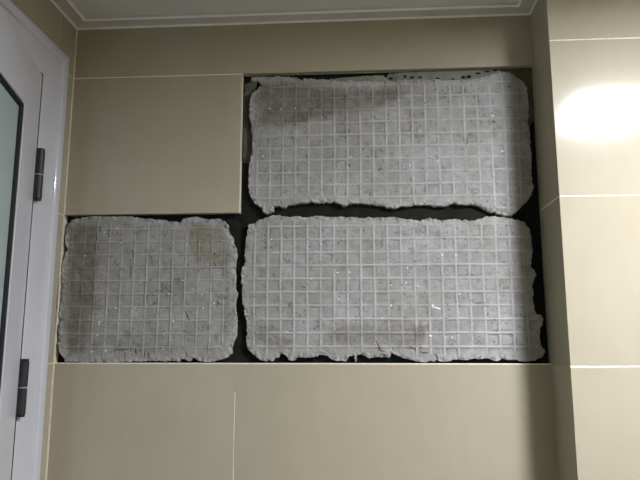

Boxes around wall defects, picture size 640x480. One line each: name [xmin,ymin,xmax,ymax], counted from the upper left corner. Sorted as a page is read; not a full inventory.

spalling [57,68,546,363]